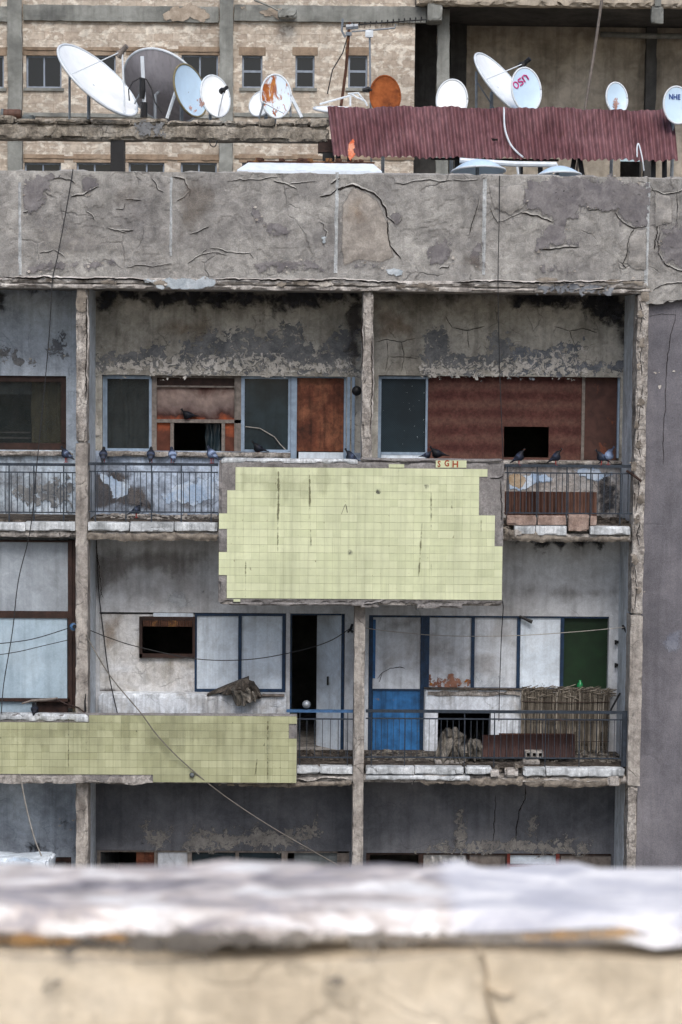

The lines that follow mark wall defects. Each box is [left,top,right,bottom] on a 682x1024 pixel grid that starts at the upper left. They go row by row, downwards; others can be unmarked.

crack [0,175,579,400]
peeling [95,319,361,380]
peeling [417,325,643,382]
crack [439,189,682,459]
corrosion [429,673,471,687]
spalling [417,763,621,789]
crack [493,778,593,849]